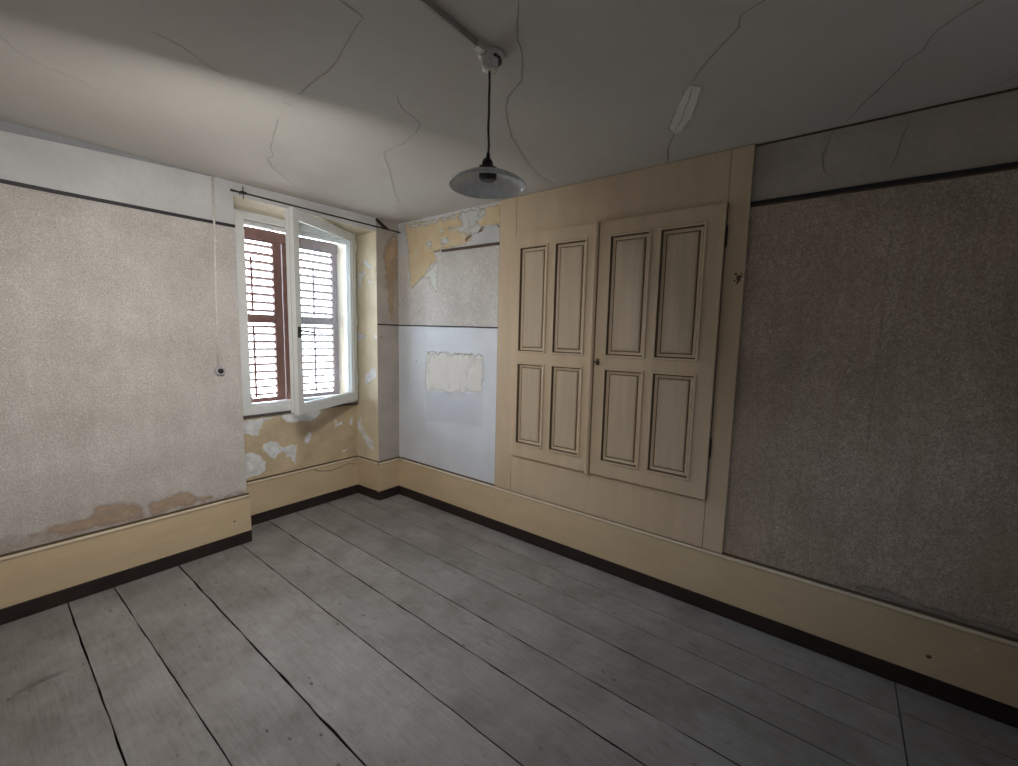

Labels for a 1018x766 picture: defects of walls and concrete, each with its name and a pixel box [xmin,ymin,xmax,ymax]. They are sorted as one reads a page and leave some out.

crack [267,0,362,185]
crack [667,0,765,162]
peeling [244,410,321,480]